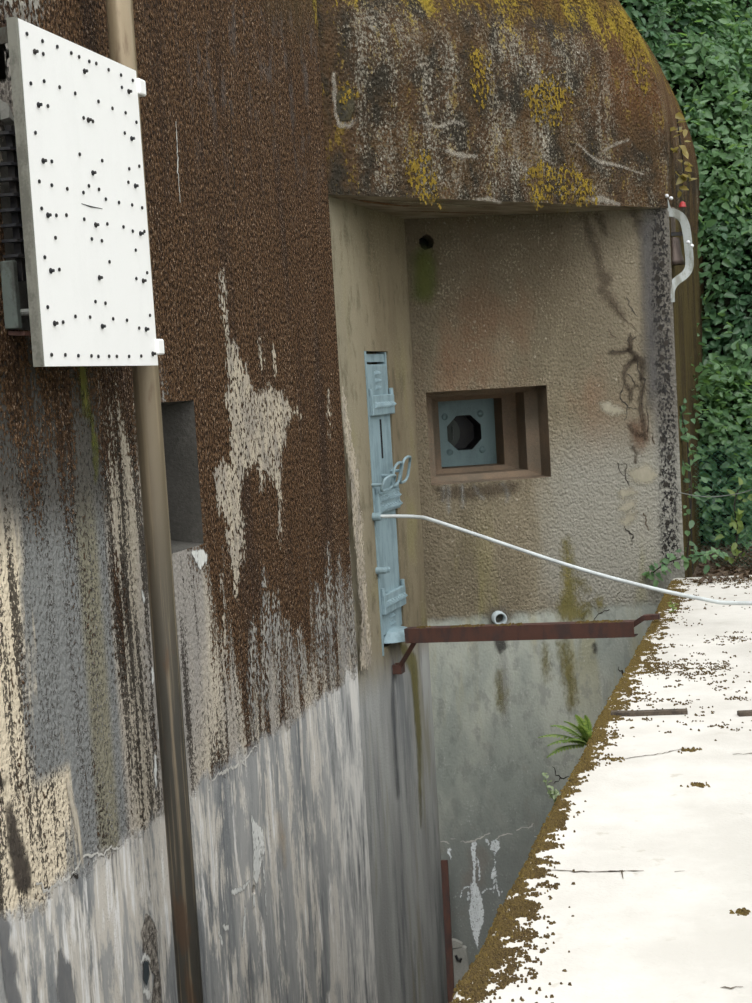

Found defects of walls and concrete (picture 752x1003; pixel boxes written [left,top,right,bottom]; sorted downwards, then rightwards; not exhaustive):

crack [608,297,655,485]
leakage [5,803,32,894]
leakage [67,779,82,860]
efflorescence [460,838,503,949]